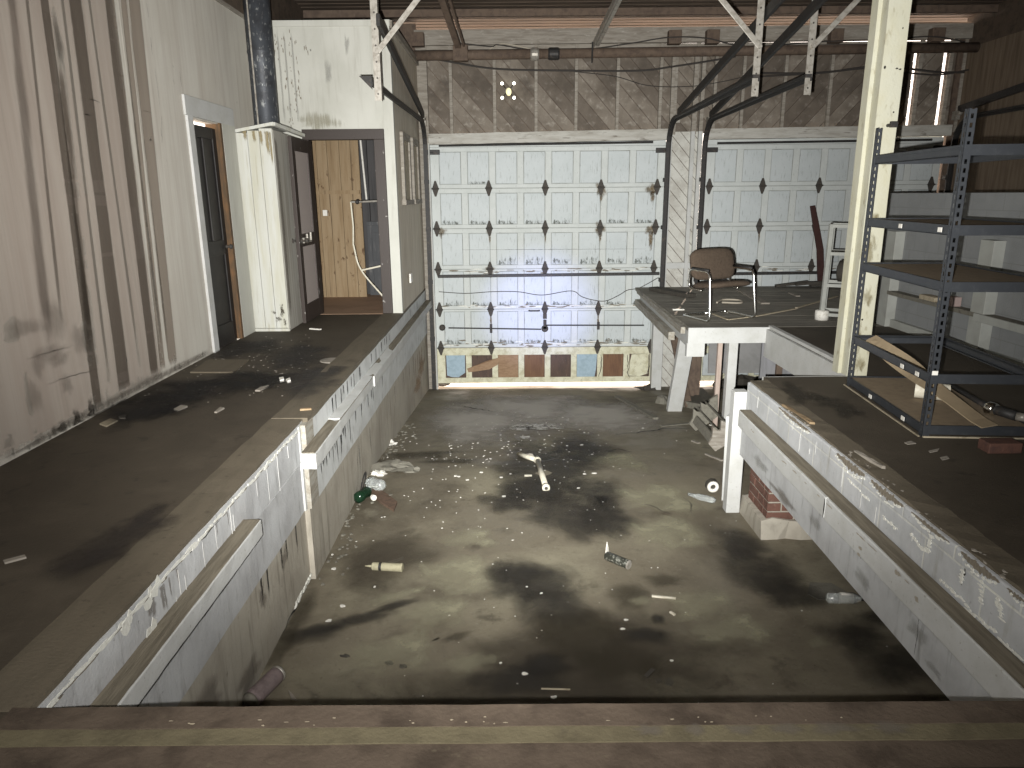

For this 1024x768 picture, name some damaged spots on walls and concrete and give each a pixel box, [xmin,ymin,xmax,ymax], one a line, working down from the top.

damp [0,0,176,456]
peeling [46,430,299,708]
spalling [283,573,312,632]
peeling [835,451,1024,661]